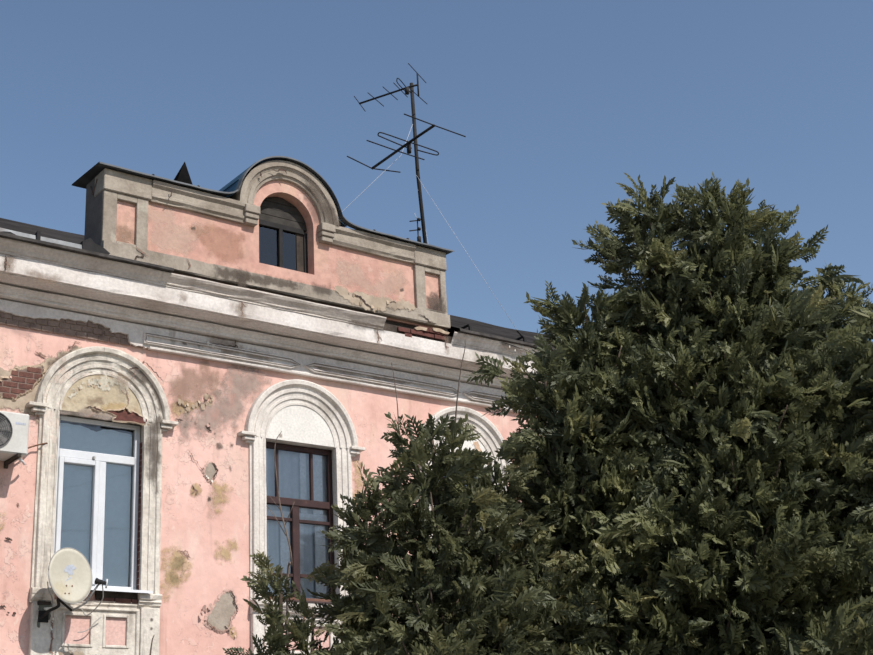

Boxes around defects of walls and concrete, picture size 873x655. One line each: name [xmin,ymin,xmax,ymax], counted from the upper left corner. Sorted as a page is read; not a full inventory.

spalling [334,285,415,313]
flaking render [349,320,453,344]
flaking render [0,311,150,426]
spalling [189,451,219,483]
spalling [199,588,239,638]